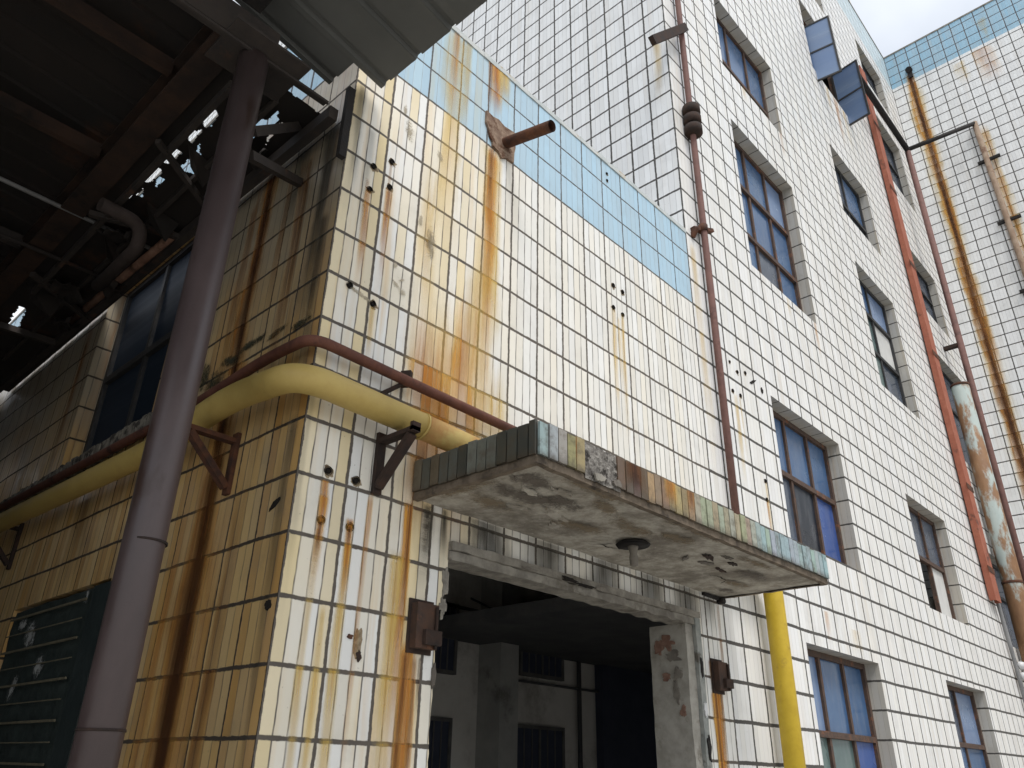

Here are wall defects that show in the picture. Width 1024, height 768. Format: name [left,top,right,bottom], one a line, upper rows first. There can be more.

corrosion [490,63,508,101]
corrosion [483,150,497,297]
corrosion [908,77,1024,487]
spalling [585,442,622,493]
spalling [347,628,363,662]
peeling [654,635,687,717]
corrosion [712,693,726,768]